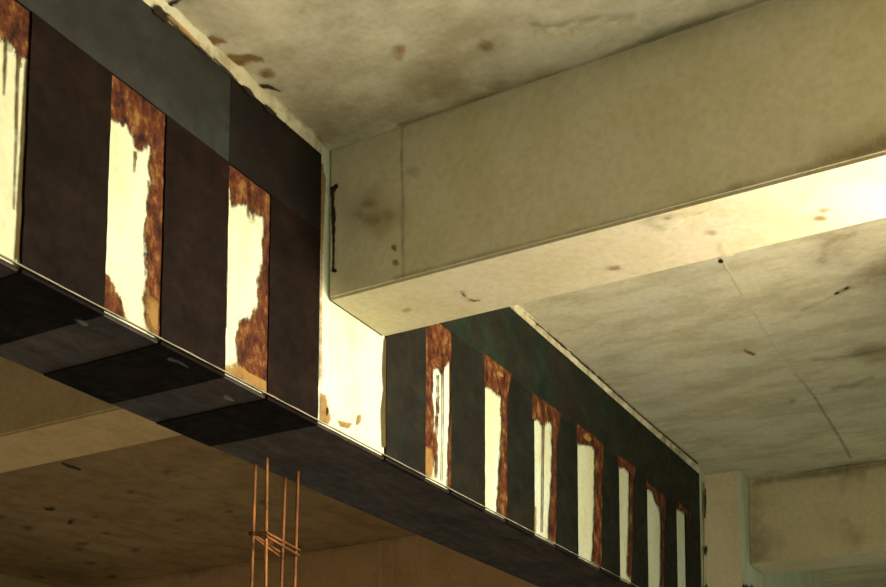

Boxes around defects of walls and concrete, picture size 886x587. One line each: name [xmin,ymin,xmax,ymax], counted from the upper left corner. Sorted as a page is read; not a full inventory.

rust [0,0,30,260]
rust [104,273,127,319]
rust [111,75,165,337]
rust [225,166,270,392]
rust [320,393,362,428]
rust [426,323,451,488]
rust [483,354,511,517]
rust [532,393,561,542]
rust [576,423,604,567]
rust [618,456,636,580]
rust [646,481,691,587]